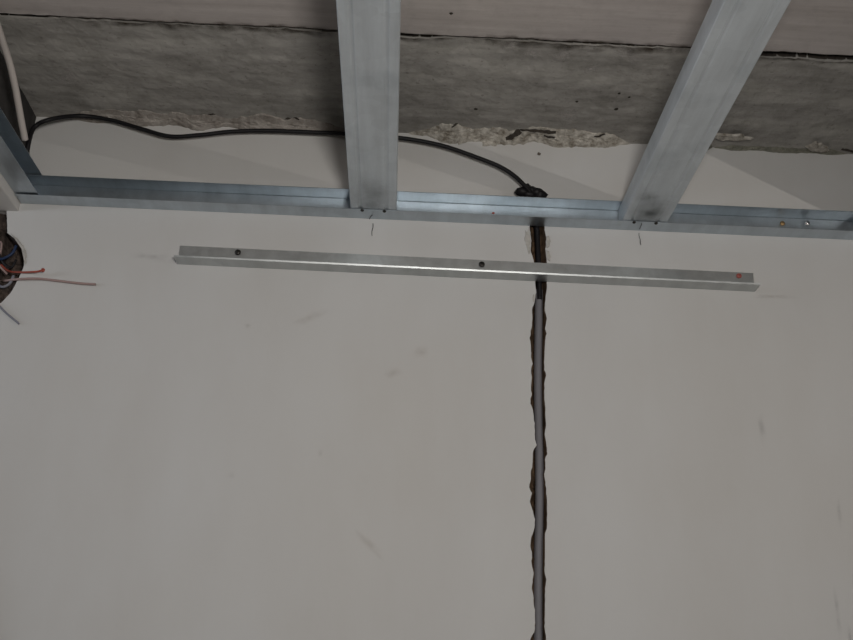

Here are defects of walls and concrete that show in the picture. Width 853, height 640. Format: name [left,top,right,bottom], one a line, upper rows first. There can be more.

peeling [0,14,345,131]
peeling [398,34,691,155]
peeling [708,52,853,155]